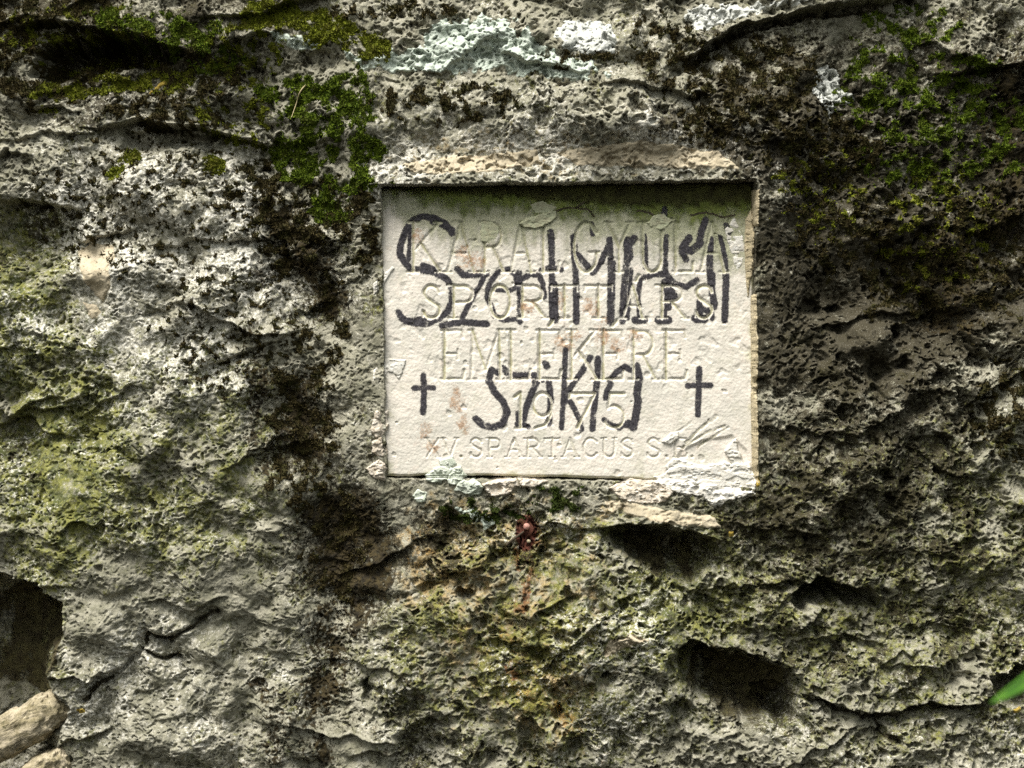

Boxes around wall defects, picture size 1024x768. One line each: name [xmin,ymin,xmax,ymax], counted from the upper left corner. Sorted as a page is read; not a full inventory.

corrosion [514,514,540,613]
crack [144,609,220,660]
crack [82,675,115,701]